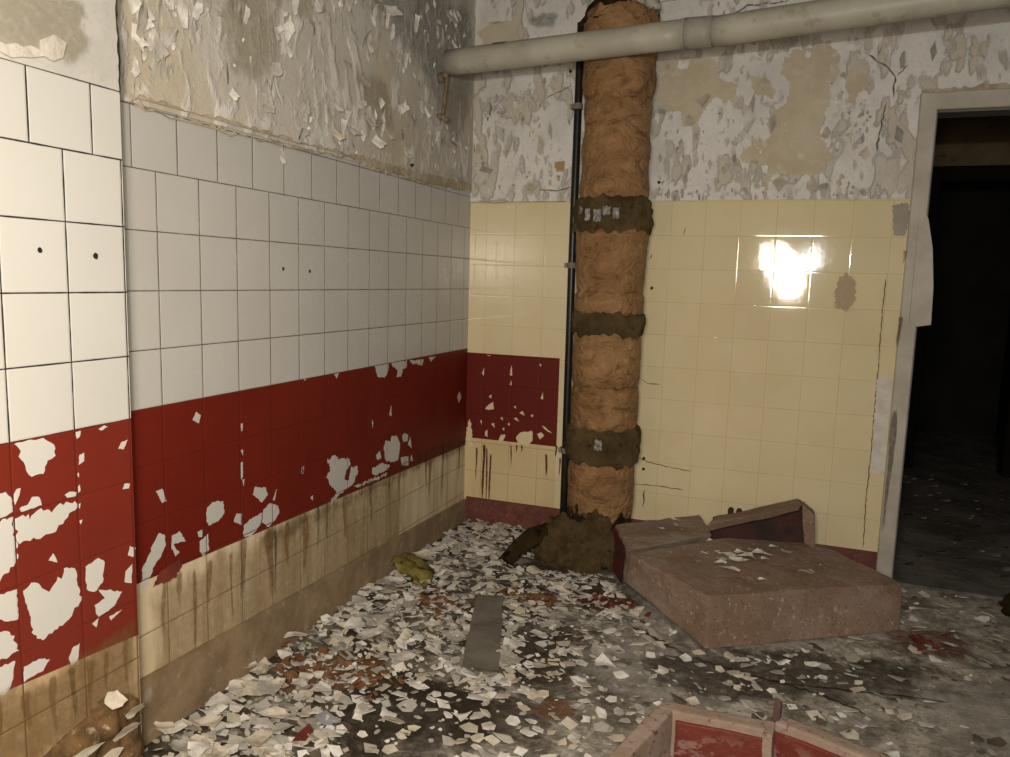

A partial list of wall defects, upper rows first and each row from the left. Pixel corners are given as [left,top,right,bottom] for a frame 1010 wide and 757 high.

spalling [0,34,67,61]
spalling [128,0,572,203]
peeling [650,40,885,202]
peeling [892,202,933,327]
peeling [15,438,56,477]
peeling [198,450,279,556]
peeling [326,433,413,504]
peeling [375,356,436,378]
peeling [466,395,551,447]
crack [863,278,886,546]
peeling [0,531,185,695]
spalling [43,690,145,757]